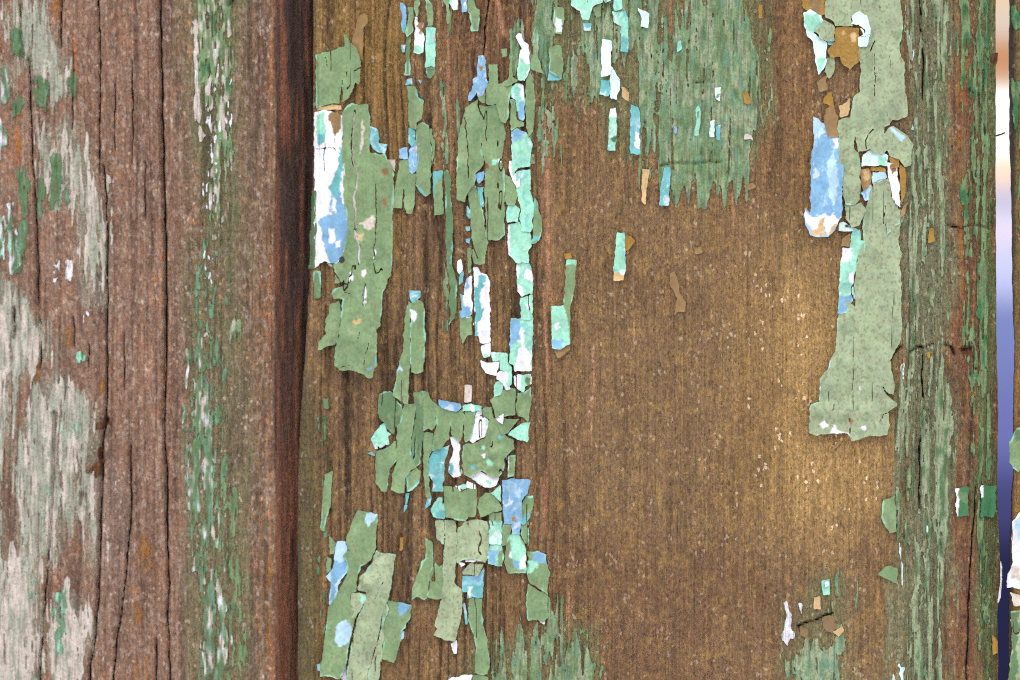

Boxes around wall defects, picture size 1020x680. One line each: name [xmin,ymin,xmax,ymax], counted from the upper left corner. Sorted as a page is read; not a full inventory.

peeling [0,0,113,680]
crack [60,0,74,127]
crack [73,0,171,680]
peeling [308,0,773,680]
peeling [780,569,853,680]
peeling [802,0,1020,680]